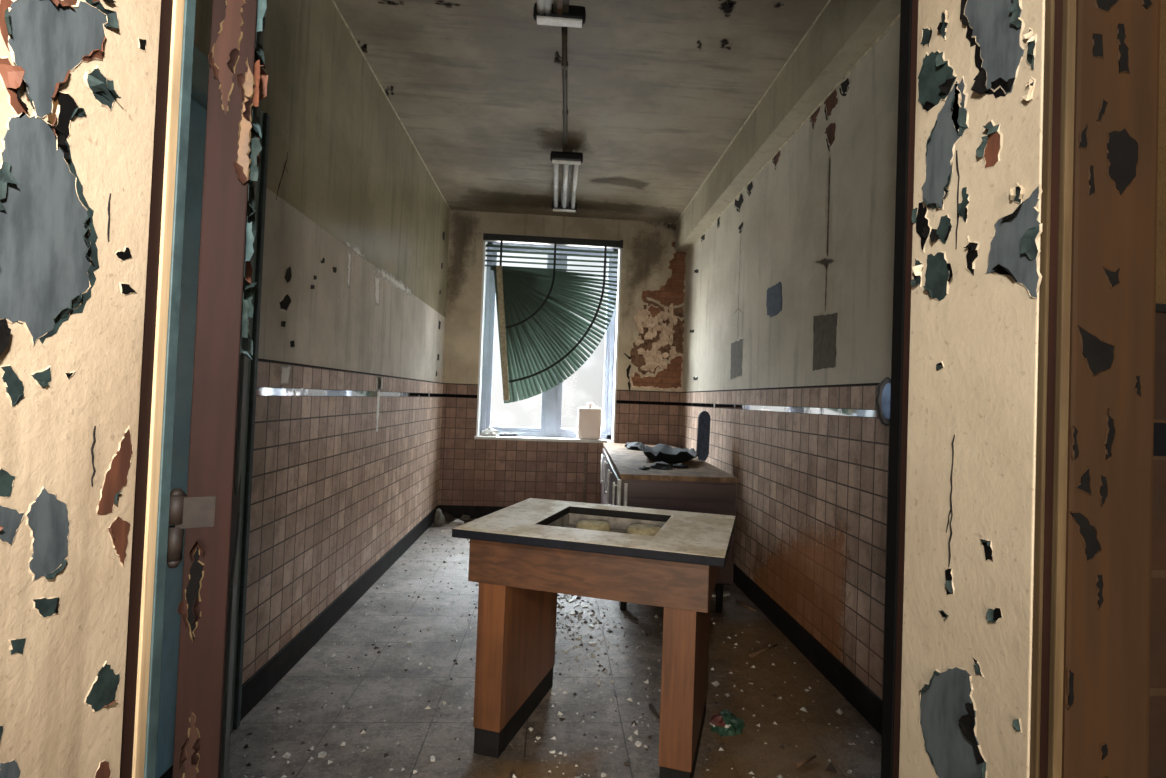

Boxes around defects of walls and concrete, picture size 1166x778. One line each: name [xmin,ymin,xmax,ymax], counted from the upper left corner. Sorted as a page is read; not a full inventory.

peeling [0,0,121,407]
peeling [115,247,133,262]
peeling [119,282,137,296]
peeling [208,0,268,360]
flaking render [625,236,699,391]
peeling [911,0,1042,301]
peeling [0,467,69,581]
peeling [96,426,133,568]
peeling [8,637,26,656]
peeling [31,596,59,618]
peeling [84,661,120,713]
peeling [919,658,988,778]